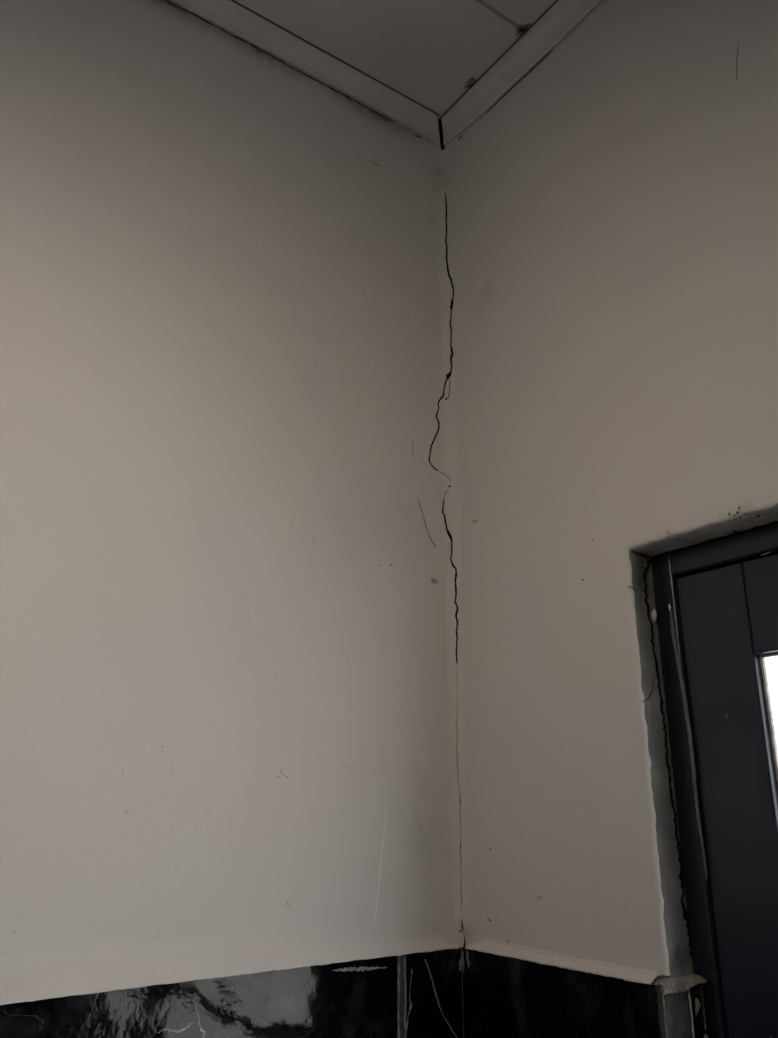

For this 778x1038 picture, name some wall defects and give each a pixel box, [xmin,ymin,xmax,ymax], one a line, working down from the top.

crack [412,193,462,911]